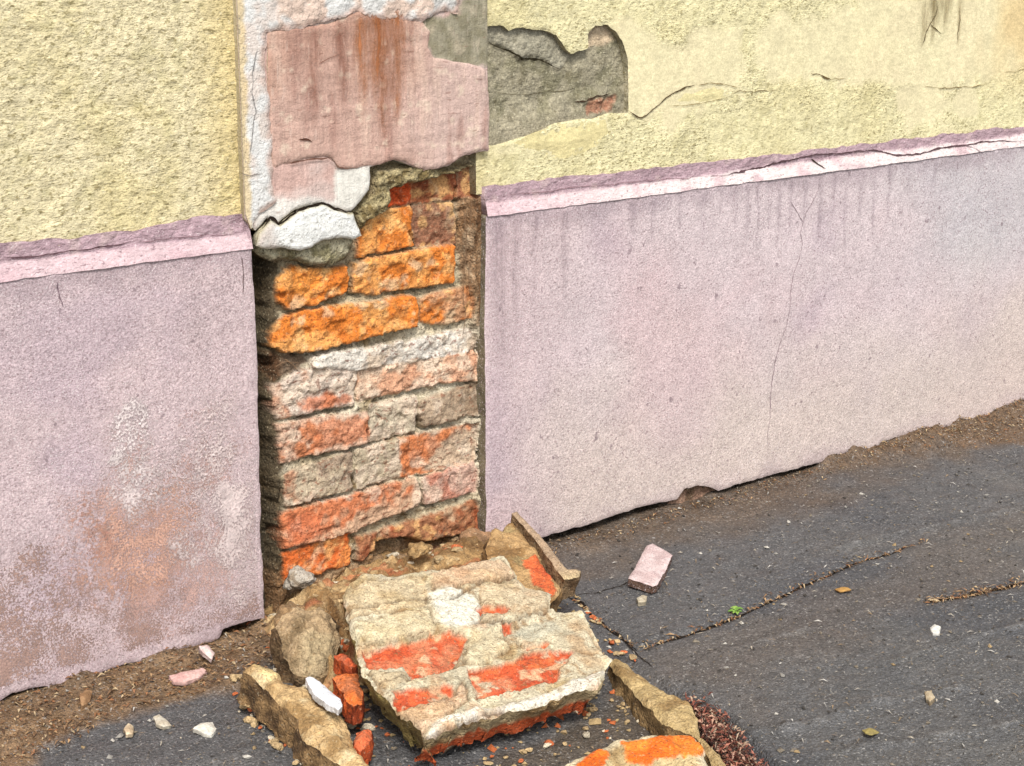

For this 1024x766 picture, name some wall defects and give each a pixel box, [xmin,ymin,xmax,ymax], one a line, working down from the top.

crack [4,202,347,259]
spalling [250,11,625,612]
crack [631,83,782,118]
crack [510,140,1024,429]
damp [0,390,259,689]